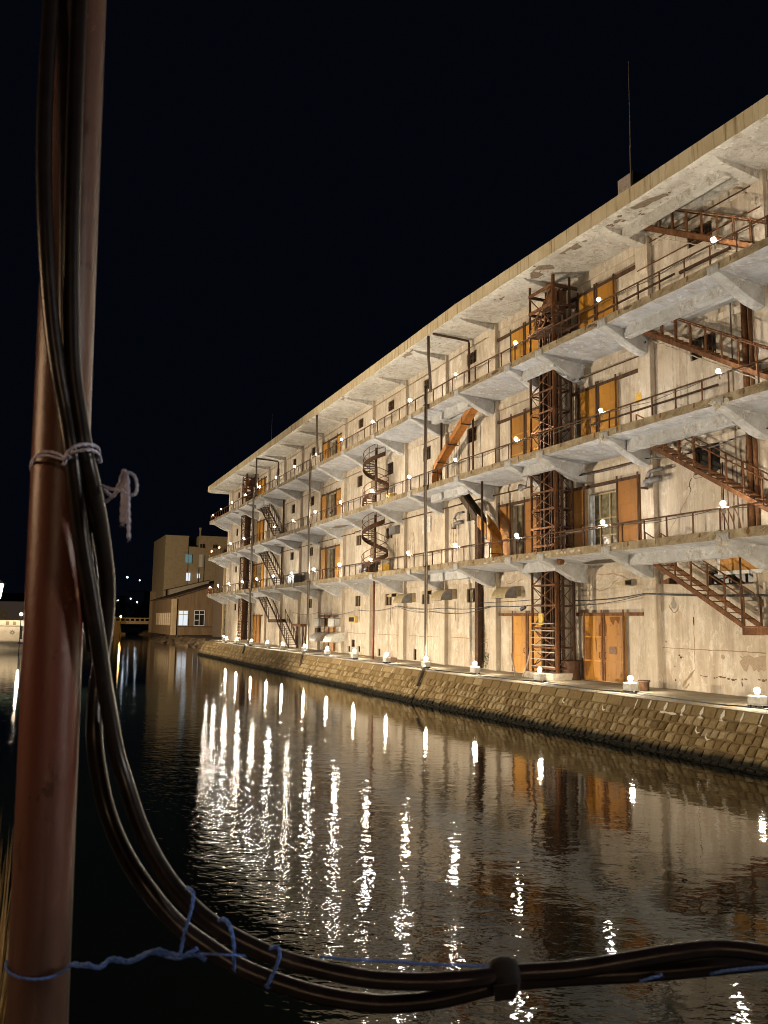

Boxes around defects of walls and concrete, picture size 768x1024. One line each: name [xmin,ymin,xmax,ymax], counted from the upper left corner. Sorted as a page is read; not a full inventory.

spalling [606,192,671,227]
corrosion [720,448,749,534]
peeling [700,655,767,687]